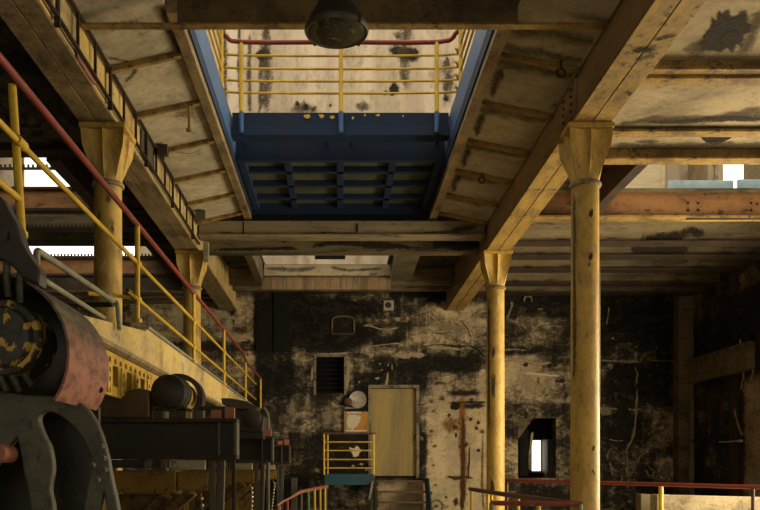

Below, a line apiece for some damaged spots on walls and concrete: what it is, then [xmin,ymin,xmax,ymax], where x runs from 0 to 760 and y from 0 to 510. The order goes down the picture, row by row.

water stain [237,30,272,111]
water stain [385,30,419,96]
water stain [684,10,760,54]
rust [443,397,484,510]
water stain [609,393,641,477]